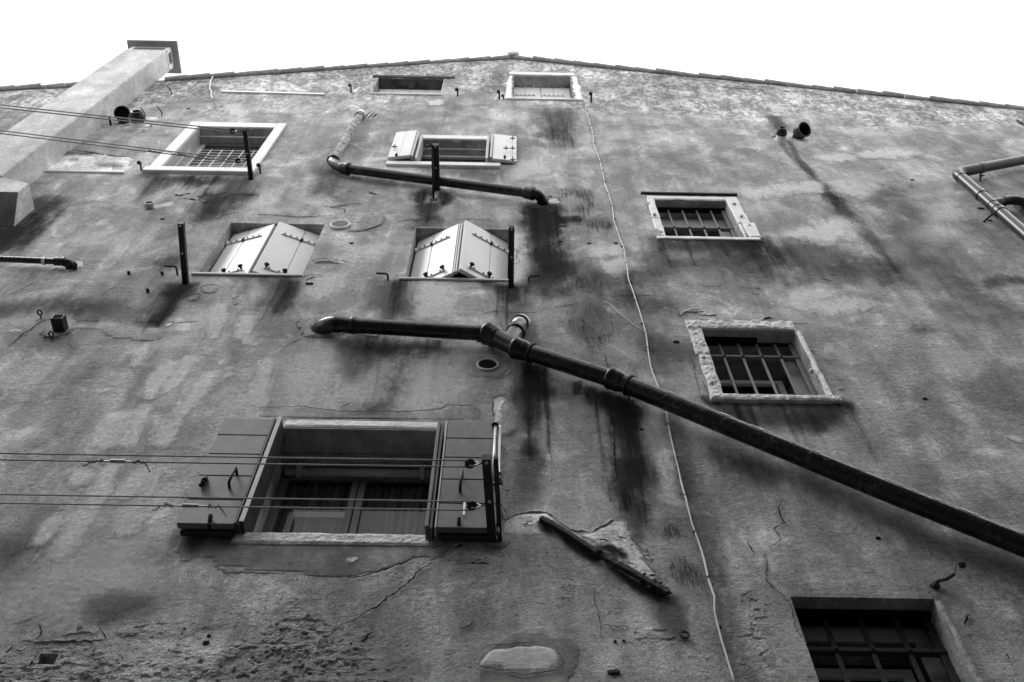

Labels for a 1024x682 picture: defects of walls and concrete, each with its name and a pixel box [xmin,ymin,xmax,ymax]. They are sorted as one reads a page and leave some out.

leakage [500,158,550,181]
leakage [498,205,578,324]
leakage [589,245,641,275]
leakage [662,239,758,285]
leakage [512,362,556,429]
flaking render [492,394,670,599]
leakage [592,390,648,507]
crack [747,498,802,638]